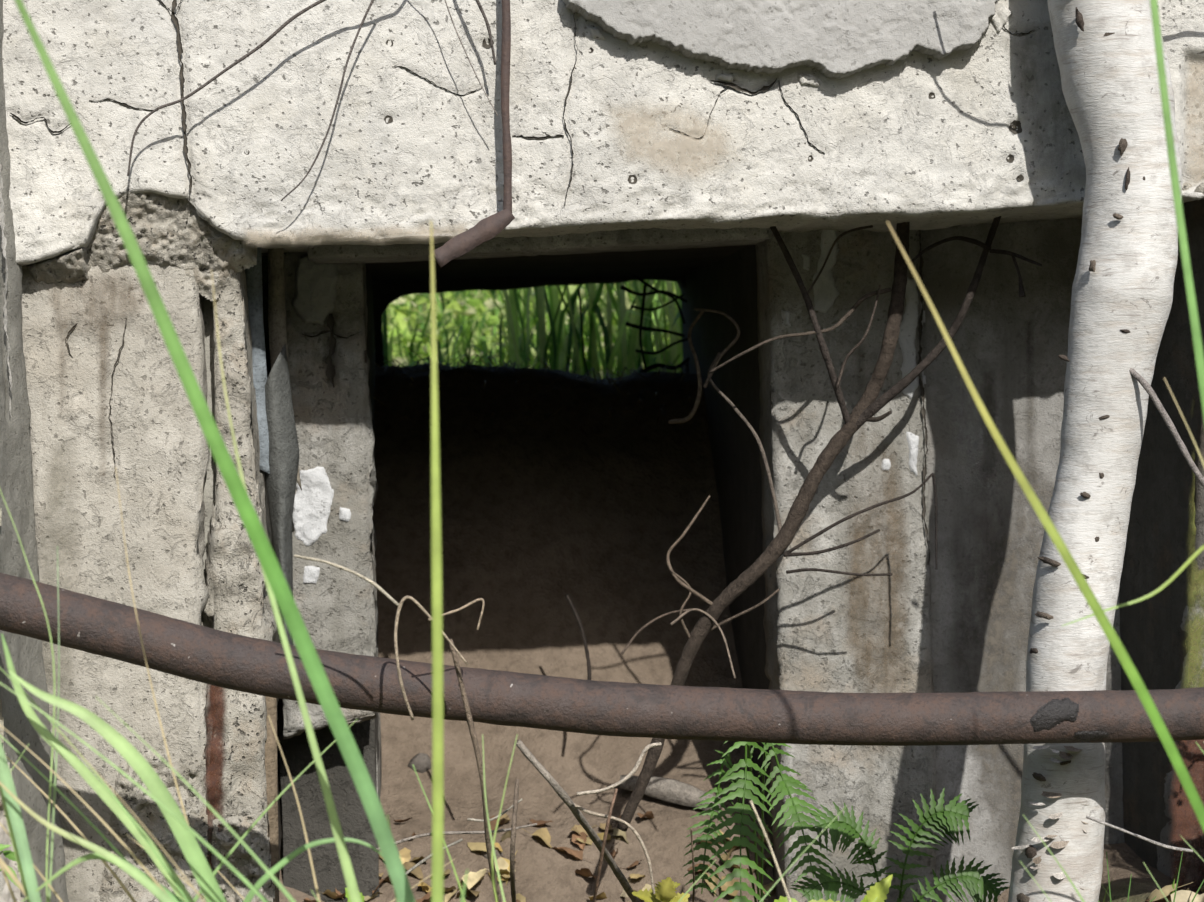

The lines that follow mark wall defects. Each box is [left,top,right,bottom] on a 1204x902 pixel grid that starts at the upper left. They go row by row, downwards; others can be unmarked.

crack [159,0,192,206]
crack [512,13,578,206]
crack [670,78,825,154]
flaking render [563,0,1013,87]
crack [0,163,12,417]
spalling [27,185,257,301]
crack [109,318,127,477]
peeling [303,566,320,585]
peeling [292,466,351,547]
damp [851,484,903,675]
damp [958,473,1054,692]
damp [975,744,1024,851]